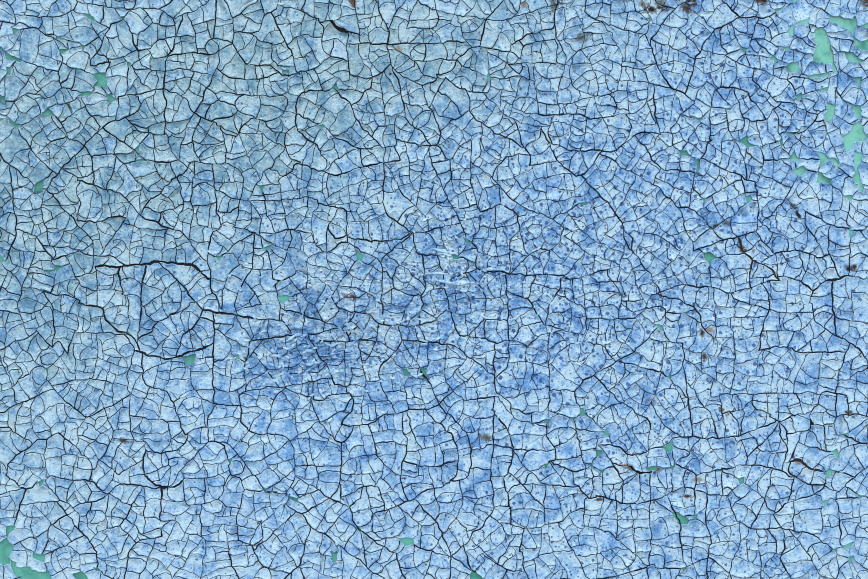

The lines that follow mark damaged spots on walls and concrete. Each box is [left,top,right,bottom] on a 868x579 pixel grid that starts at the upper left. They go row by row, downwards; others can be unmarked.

peeling [0,2,131,163]
peeling [681,0,868,256]
peeling [27,162,57,199]
peeling [0,248,16,276]
peeling [689,244,724,273]
peeling [846,265,868,295]
peeling [0,467,101,579]